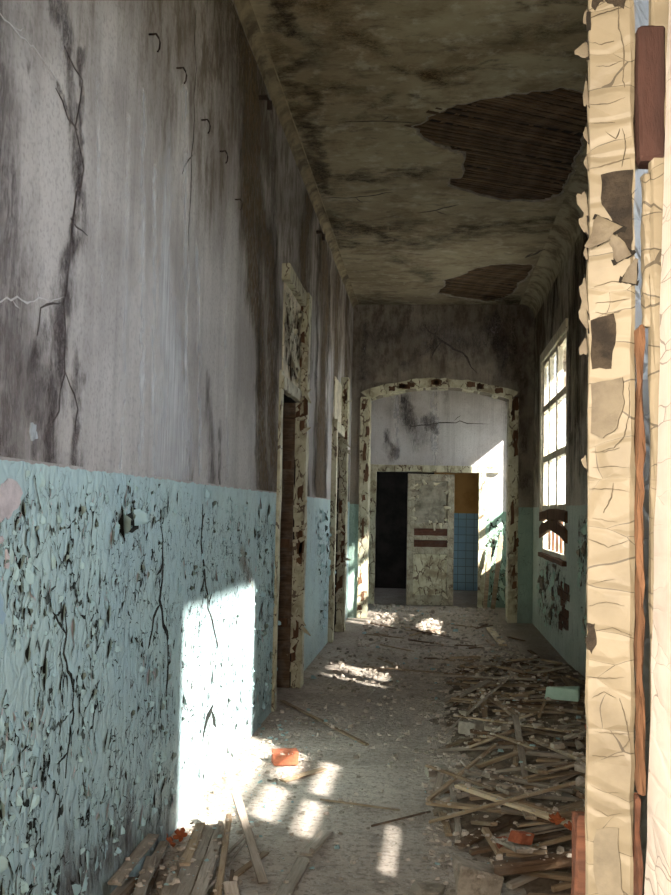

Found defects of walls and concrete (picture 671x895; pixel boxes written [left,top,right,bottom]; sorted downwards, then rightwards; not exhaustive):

peeling [574,5,591,60]
flaking render [404,74,590,202]
water stain [0,0,86,466]
crack [0,13,88,458]
water stain [140,167,221,485]
water stain [223,0,284,493]
peeling [578,274,625,438]
peeling [576,169,639,286]
peeling [292,481,351,631]
peeling [485,500,519,605]
peeling [536,517,597,654]
peeling [0,469,311,895]